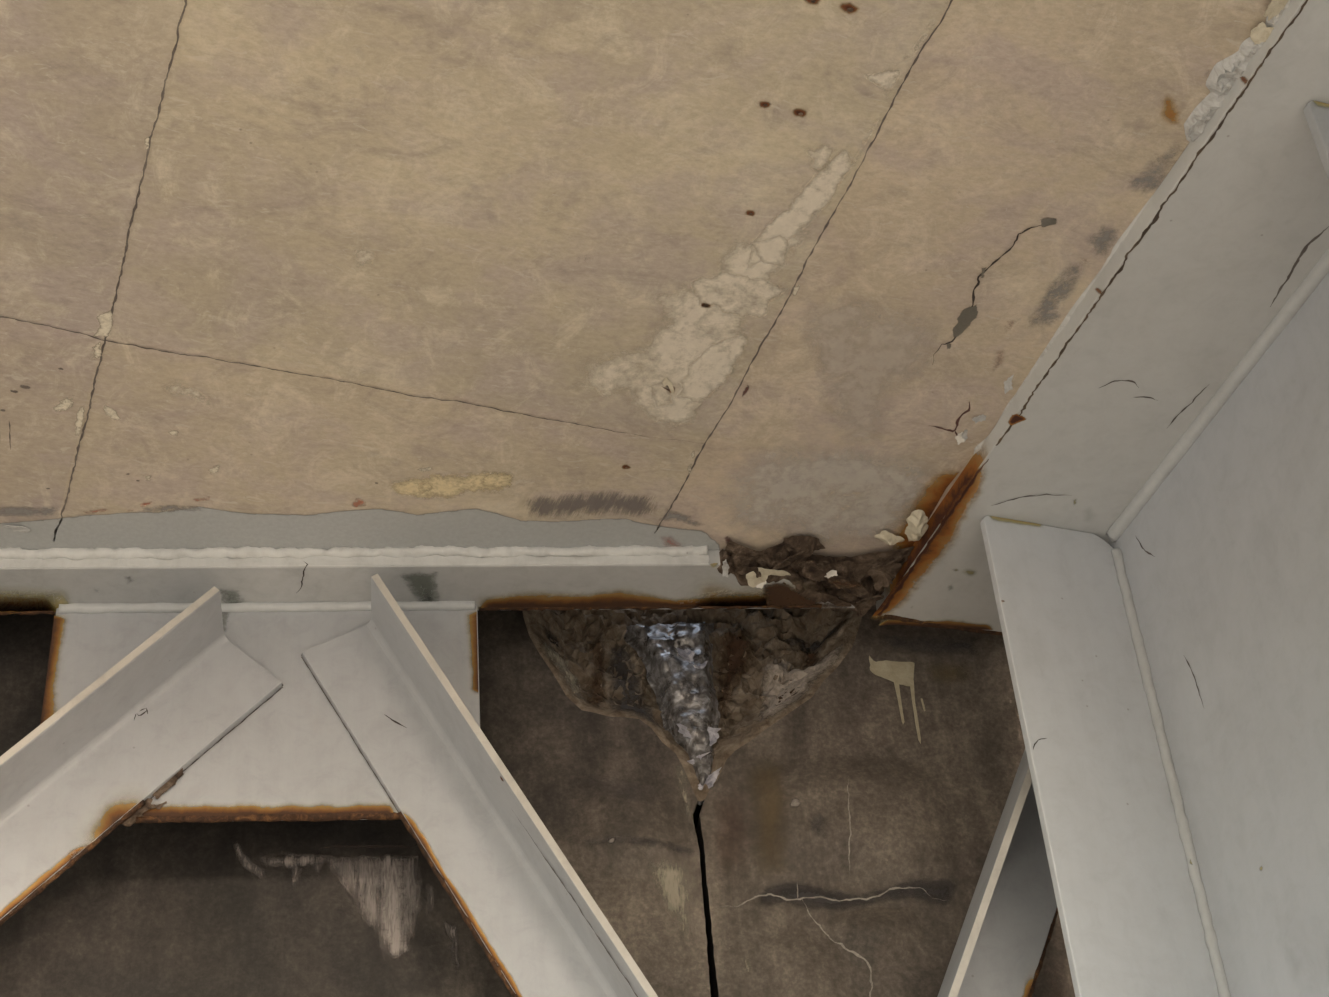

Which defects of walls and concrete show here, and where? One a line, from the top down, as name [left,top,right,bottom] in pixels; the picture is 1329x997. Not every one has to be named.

corrosion [468,0,1308,692]
crack [929,402,970,445]
crack [932,218,1056,365]
spalling [523,608,862,801]
corrosion [0,800,522,997]
leakage [236,846,434,958]
crack [696,779,950,997]